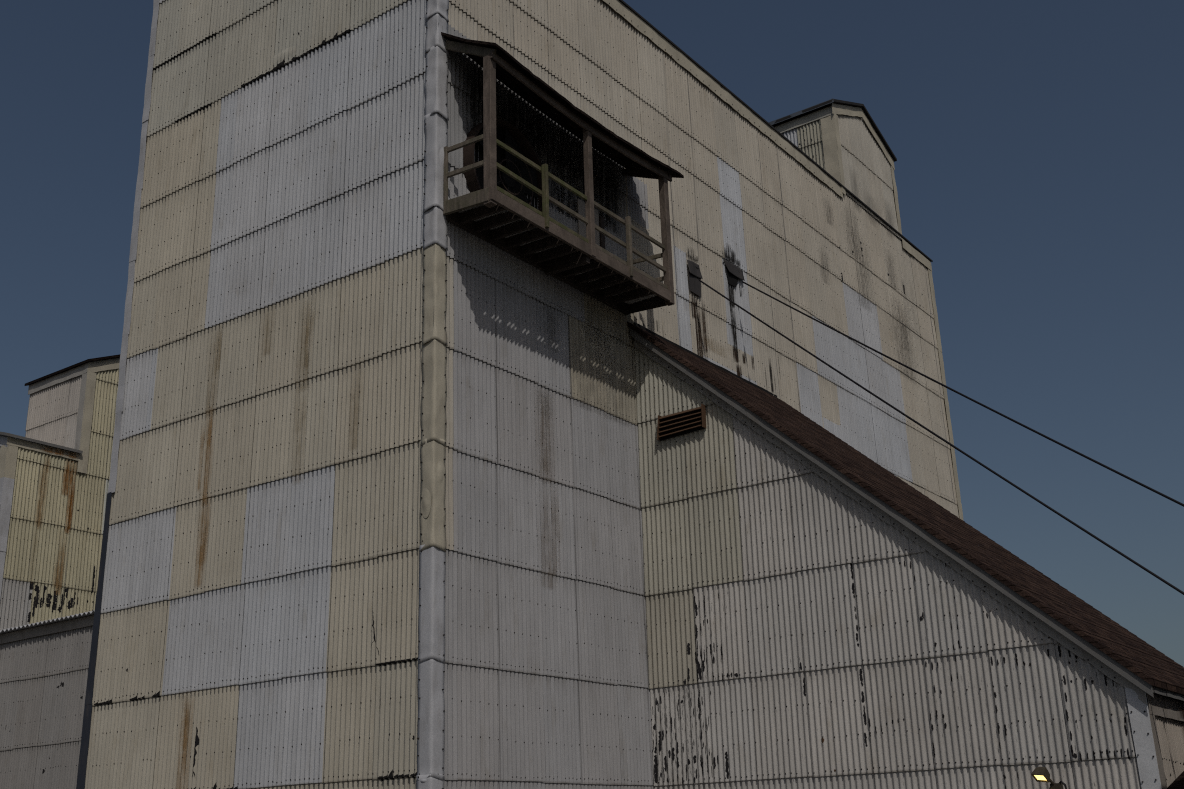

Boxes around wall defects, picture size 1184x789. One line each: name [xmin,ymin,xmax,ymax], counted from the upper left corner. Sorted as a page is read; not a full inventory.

damp [728,285,741,357]
corrosion [45,447,76,533]
peeling [27,566,95,622]
peeling [652,595,738,786]
peeling [859,669,904,746]